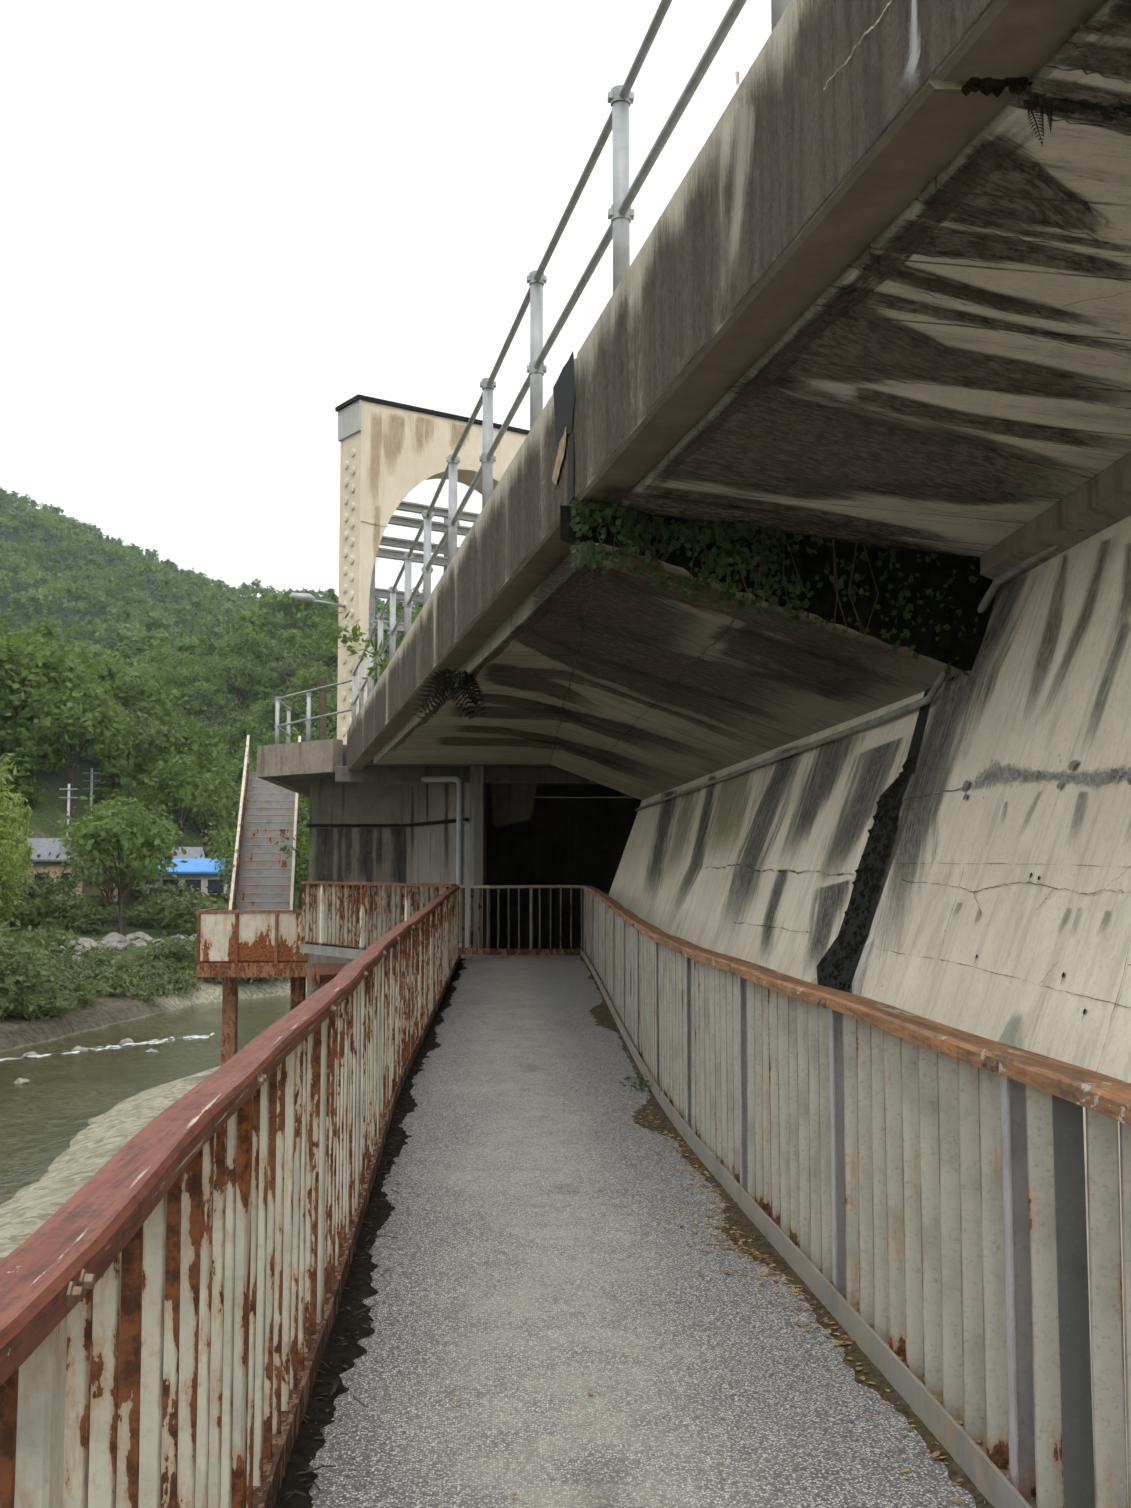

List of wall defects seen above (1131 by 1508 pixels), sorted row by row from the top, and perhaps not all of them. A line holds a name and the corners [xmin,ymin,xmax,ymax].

damp [347,0,1131,775]
damp [645,791,677,882]
damp [681,764,716,898]
damp [729,738,901,959]
crack [904,787,962,800]
damp [890,576,1025,901]
damp [851,943,872,995]